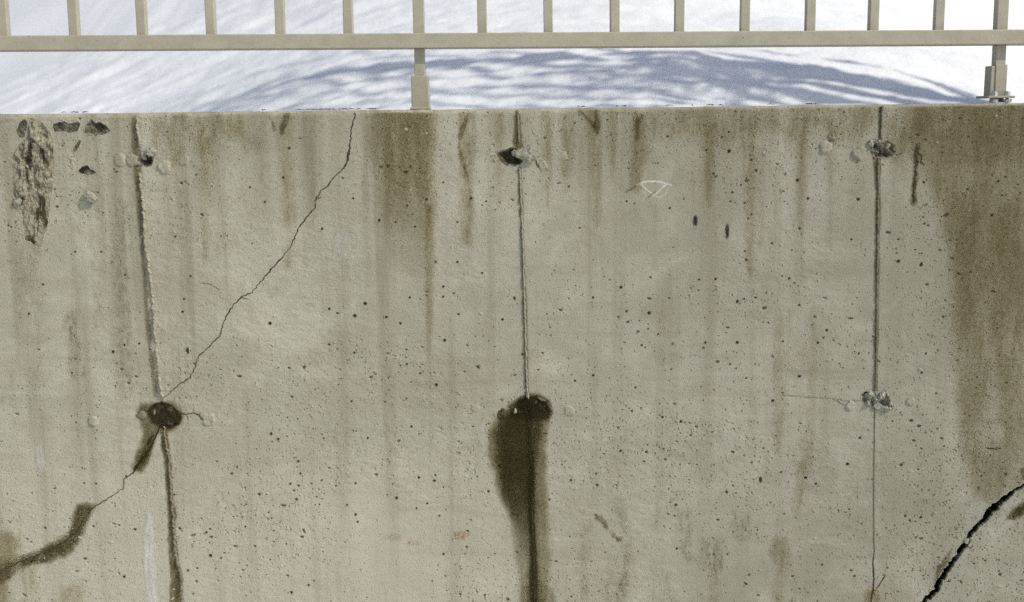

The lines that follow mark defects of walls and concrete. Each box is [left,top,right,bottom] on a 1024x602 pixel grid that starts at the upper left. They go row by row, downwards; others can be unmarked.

spalling [8,117,111,251]
crack [0,113,356,574]
water stain [501,396,550,602]
crack [871,549,885,602]
crack [919,482,1024,602]